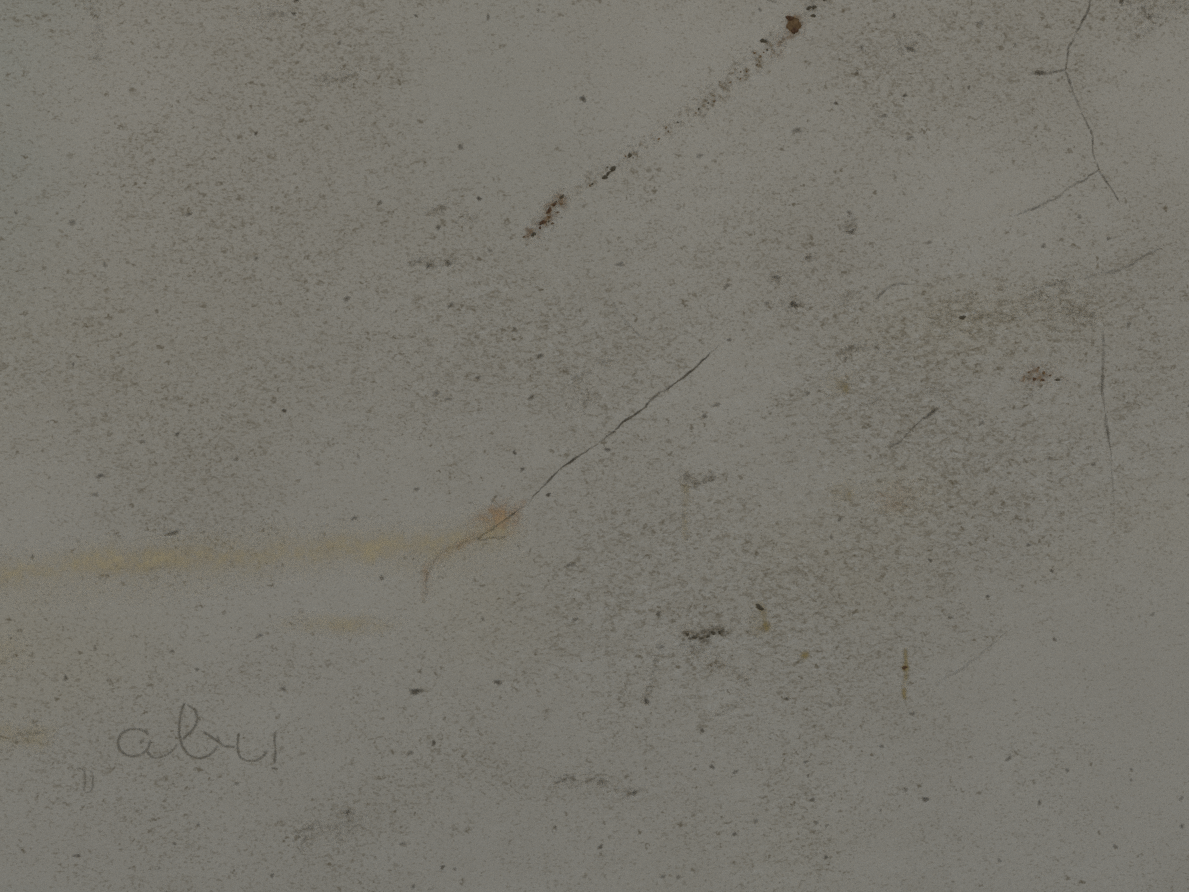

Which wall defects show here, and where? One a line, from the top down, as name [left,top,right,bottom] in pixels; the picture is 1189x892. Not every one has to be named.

corrosion [786,15,802,34]
corrosion [523,194,564,238]
crack [478,355,709,539]